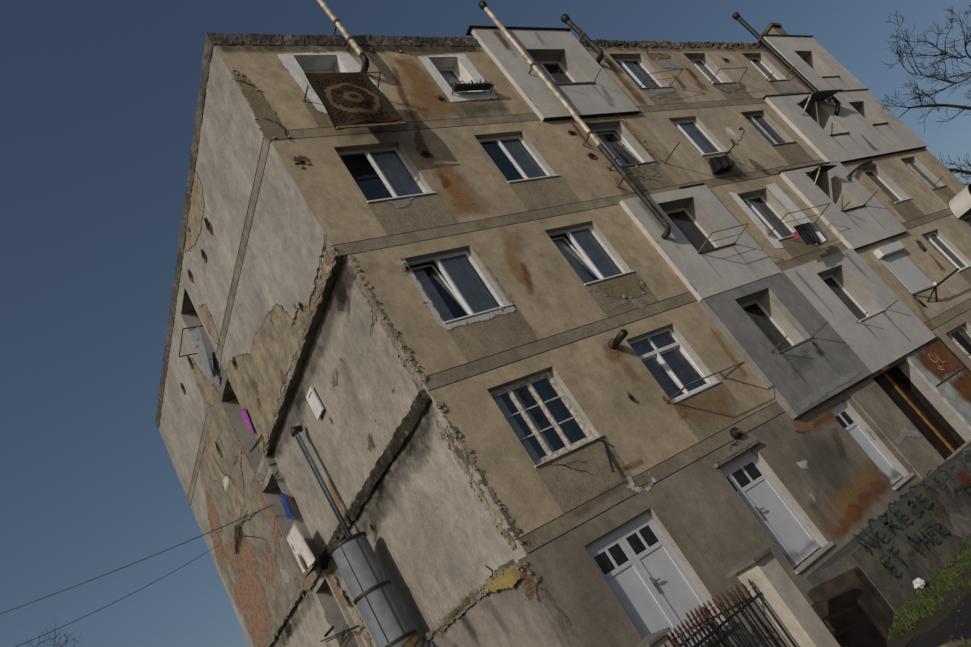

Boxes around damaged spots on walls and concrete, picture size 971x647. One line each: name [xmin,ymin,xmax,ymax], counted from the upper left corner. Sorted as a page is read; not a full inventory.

flaking render [232,68,290,141]
rust [393,59,451,150]
flaking render [185,171,212,263]
rust [916,337,971,403]
flaking render [187,234,428,647]
spalling [434,401,530,550]
spalling [477,561,540,601]